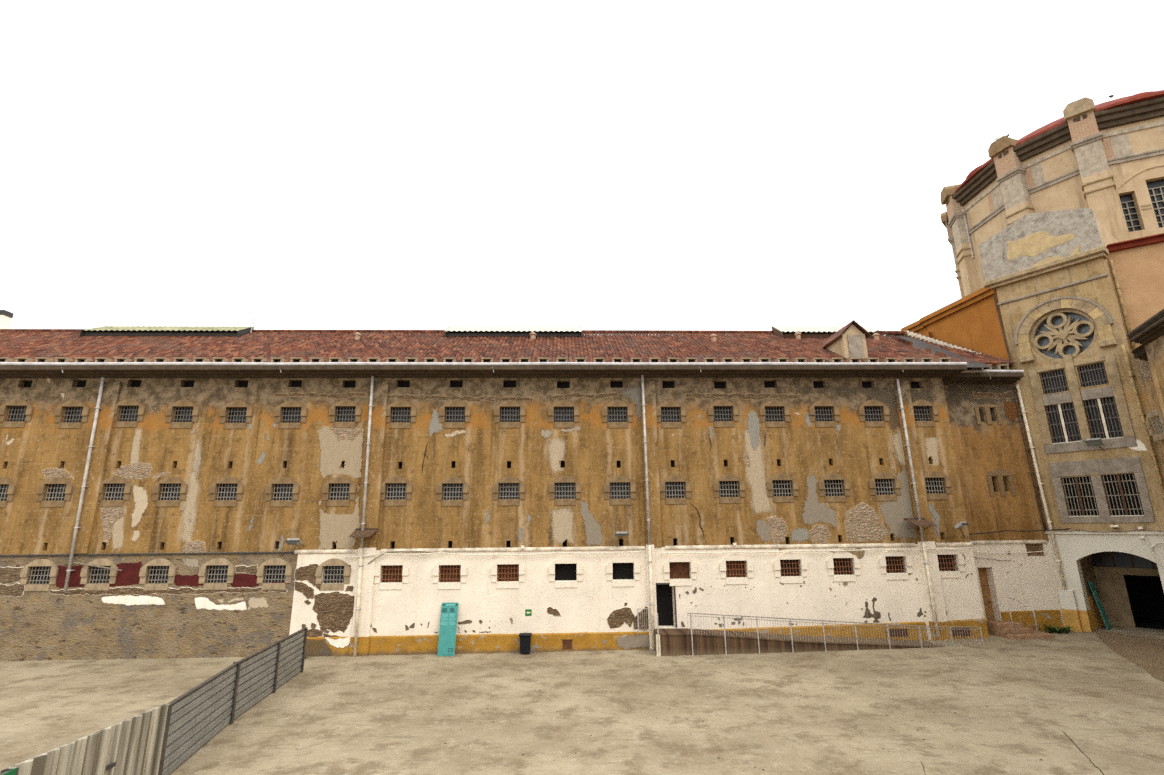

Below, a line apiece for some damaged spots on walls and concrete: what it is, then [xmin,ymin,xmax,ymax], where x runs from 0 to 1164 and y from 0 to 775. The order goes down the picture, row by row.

flaking render [41,468,74,480]
flaking render [49,426,364,648]
flaking render [765,515,788,550]
flaking render [809,502,889,559]
flaking render [603,603,650,650]